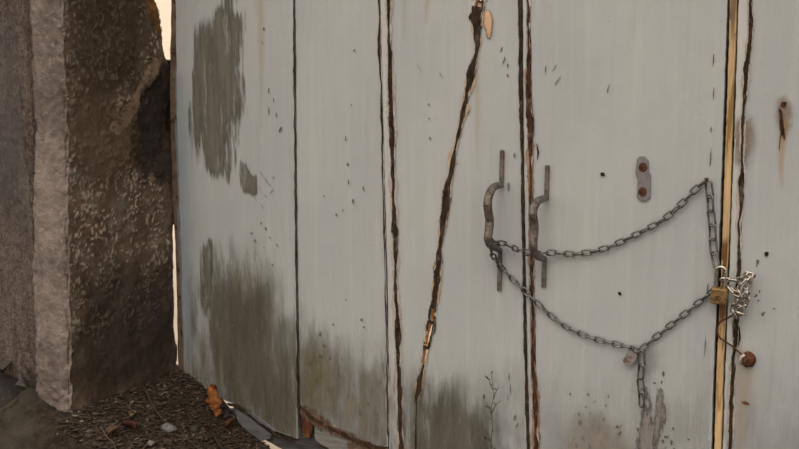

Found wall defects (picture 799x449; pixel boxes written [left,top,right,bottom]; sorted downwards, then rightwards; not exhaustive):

water stain [212,286,289,430]
crack [377,0,486,449]
crack [518,0,540,449]
crack [727,0,755,449]